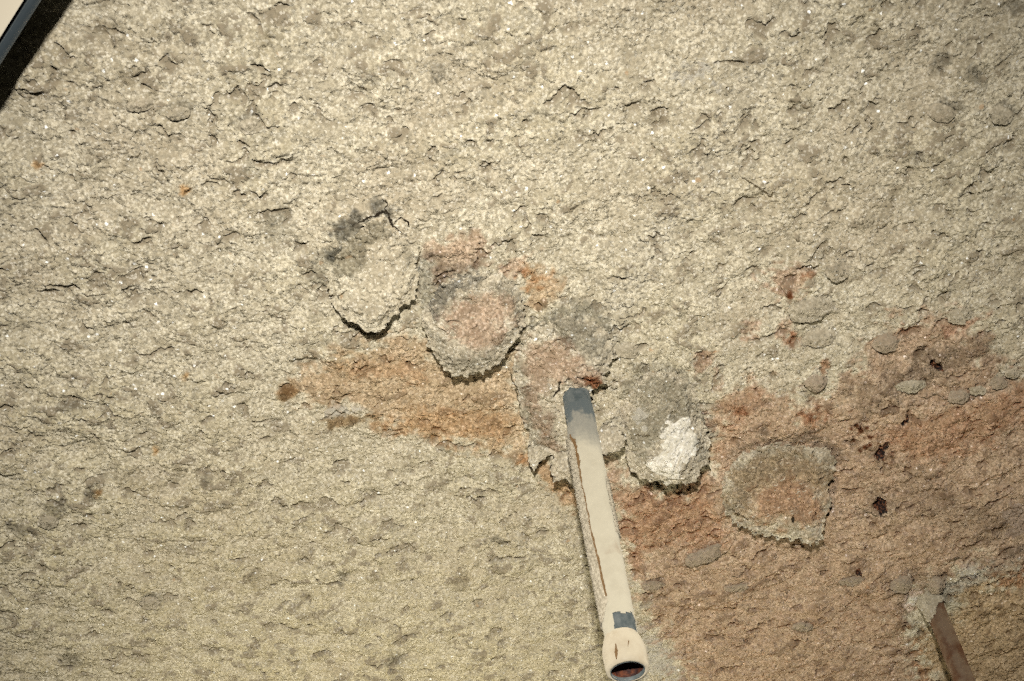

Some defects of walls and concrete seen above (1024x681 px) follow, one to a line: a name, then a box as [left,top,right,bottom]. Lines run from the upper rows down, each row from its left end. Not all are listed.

peeling [421,271,618,485]
peeling [598,369,712,486]